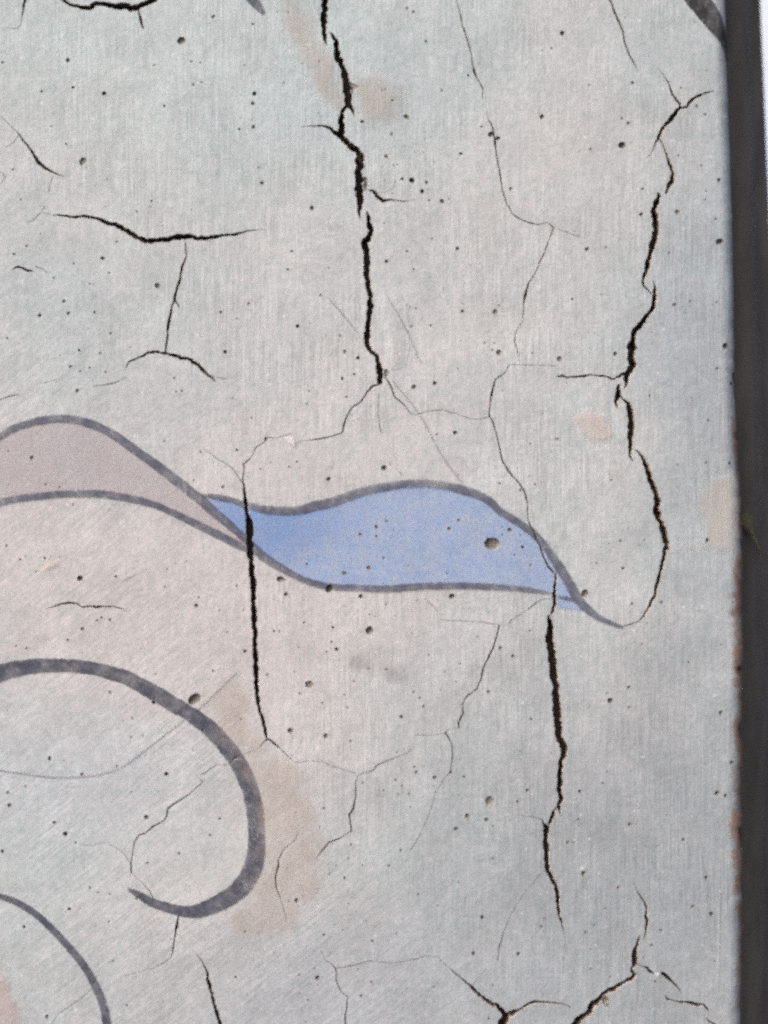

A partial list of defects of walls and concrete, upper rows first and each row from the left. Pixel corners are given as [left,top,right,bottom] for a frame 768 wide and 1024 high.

crack [62,0,158,29]
crack [0,115,265,386]
crack [89,0,715,961]
crack [46,601,127,612]
crack [52,915,222,1024]
crack [321,884,715,1024]